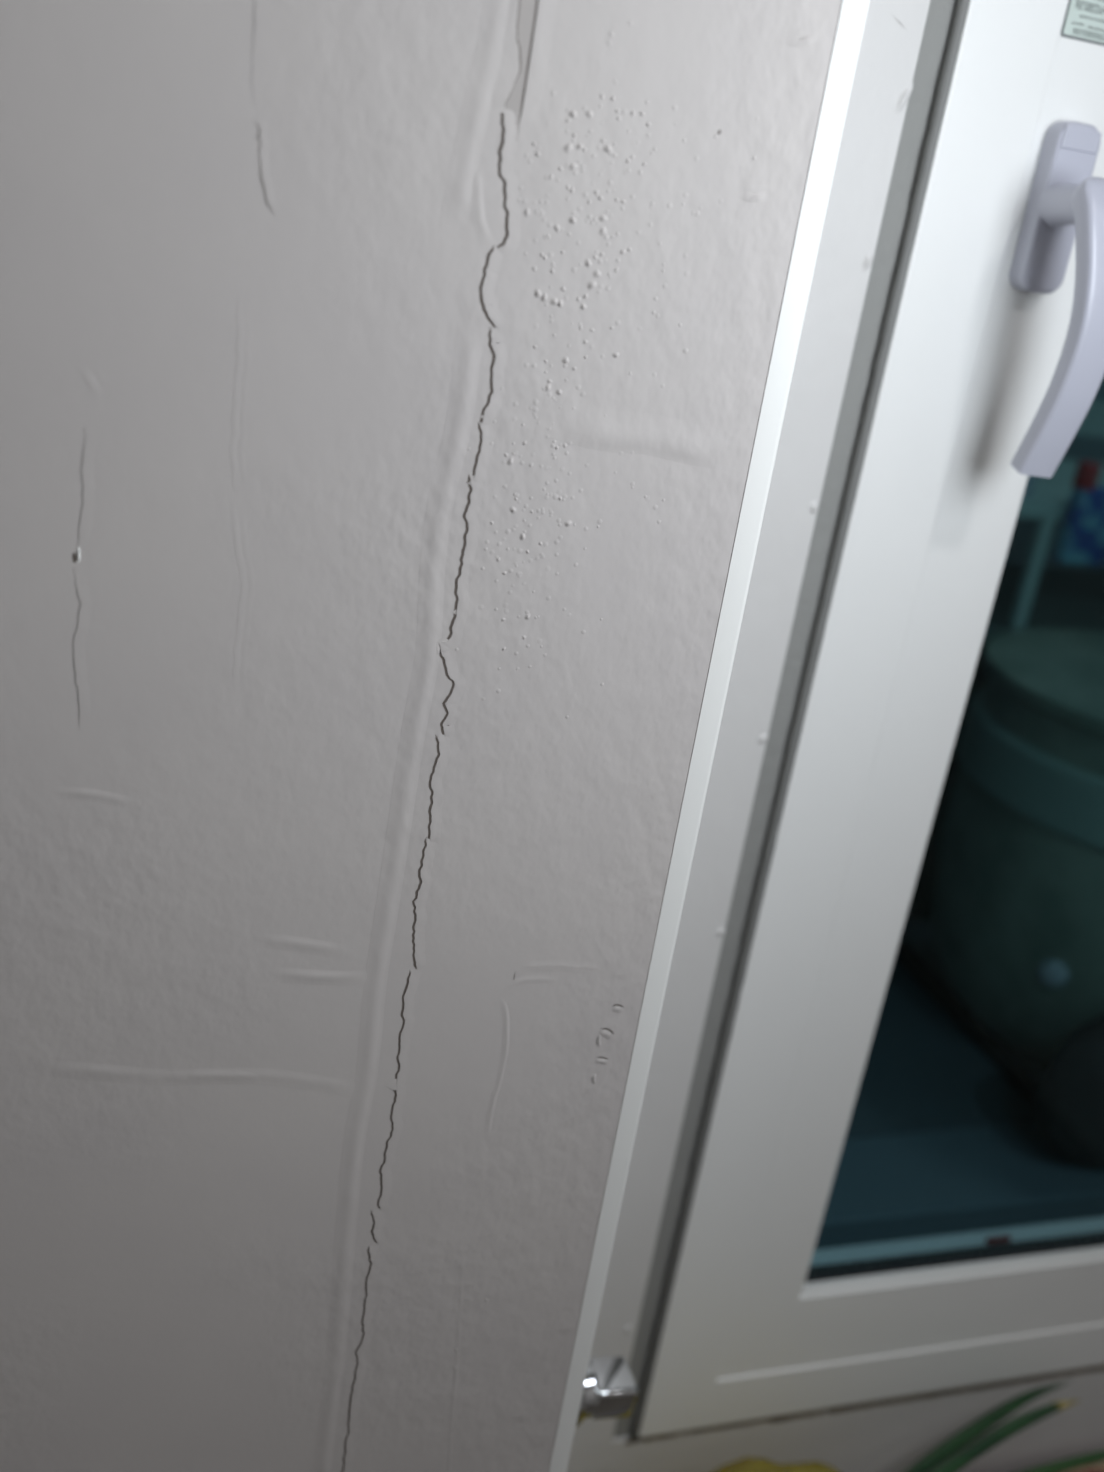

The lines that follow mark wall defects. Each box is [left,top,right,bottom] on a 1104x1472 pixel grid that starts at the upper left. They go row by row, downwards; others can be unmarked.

crack [341,109,521,1472]